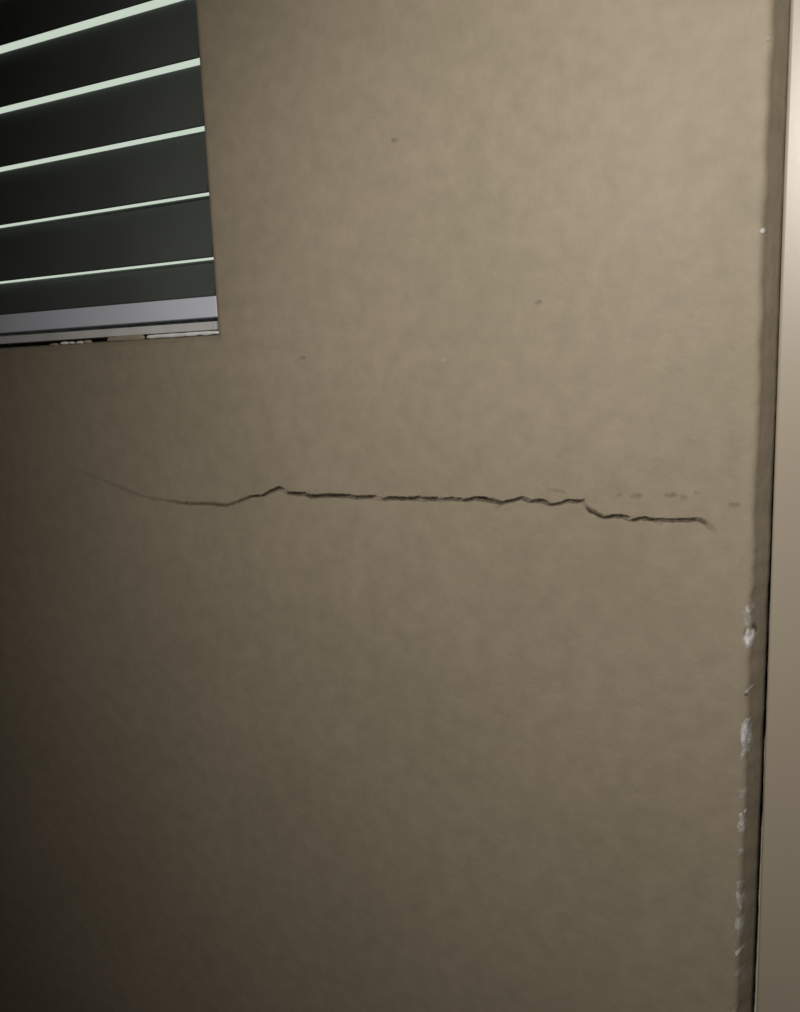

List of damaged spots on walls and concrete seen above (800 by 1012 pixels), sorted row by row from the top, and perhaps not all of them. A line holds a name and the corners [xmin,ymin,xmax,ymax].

crack [194,486,704,524]
peeling [744,605,757,647]
peeling [741,718,752,756]